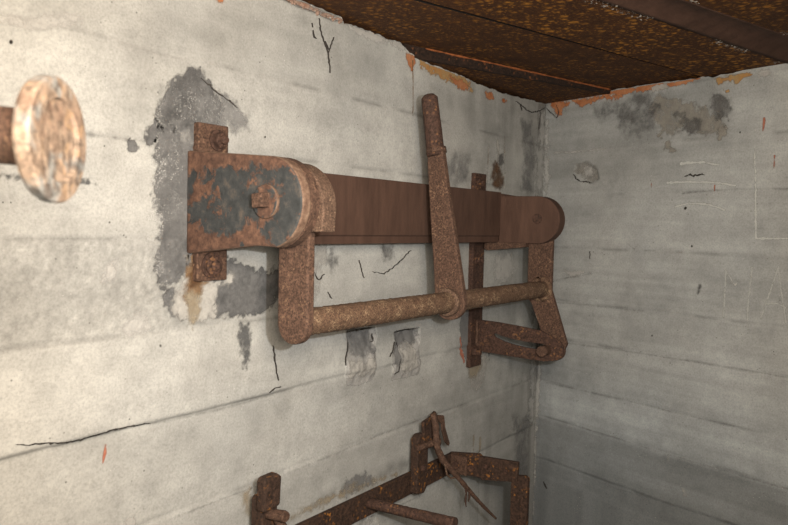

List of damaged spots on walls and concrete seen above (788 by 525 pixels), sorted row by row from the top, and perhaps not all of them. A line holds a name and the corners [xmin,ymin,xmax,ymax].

crack [311,18,334,73]
corrosion [406,54,473,92]
corrosion [425,48,700,116]
crack [516,101,559,130]
water stain [712,94,732,121]
water stain [127,66,279,322]
crack [358,250,412,278]
corrosion [183,255,208,323]
crack [16,423,151,446]